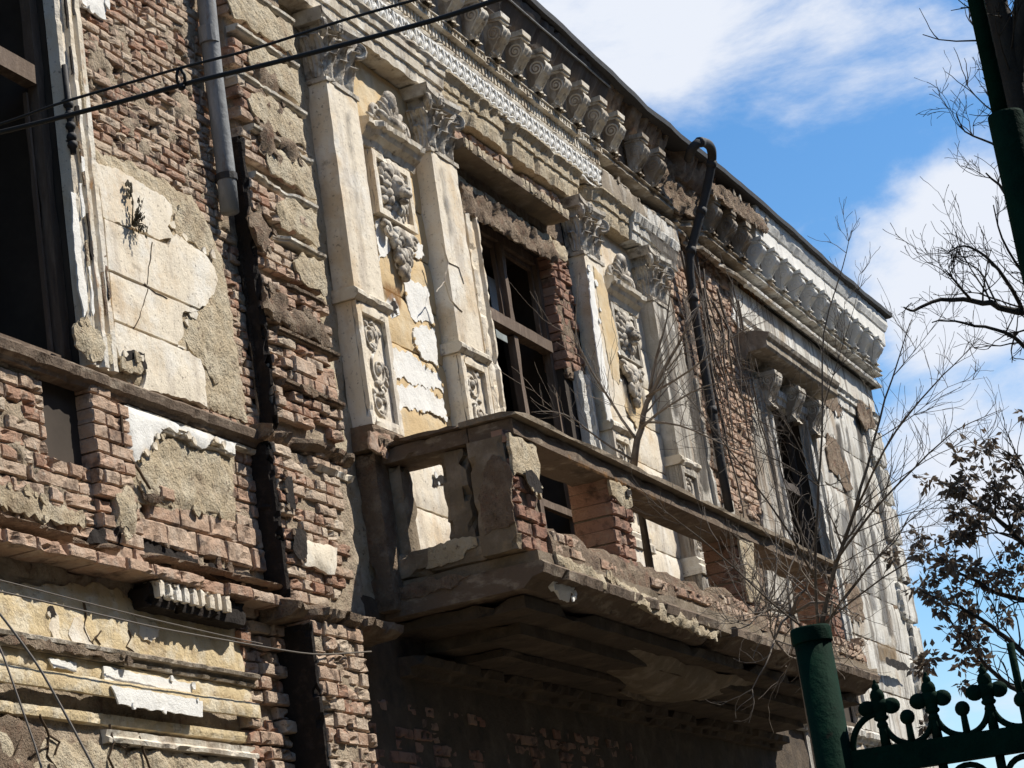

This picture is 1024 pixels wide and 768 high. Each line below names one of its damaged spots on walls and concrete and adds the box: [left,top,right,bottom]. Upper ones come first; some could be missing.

peeling [69,46,87,126]
flaking render [252,62,303,167]
peeling [70,140,147,375]
crack [132,242,168,329]
flaking render [169,205,216,259]
flaking render [184,305,230,385]
flaking render [246,205,277,254]
flaking render [261,281,333,348]
peeling [386,279,448,422]
flaking render [0,405,268,590]
spalling [426,455,515,569]
spalling [548,551,720,642]